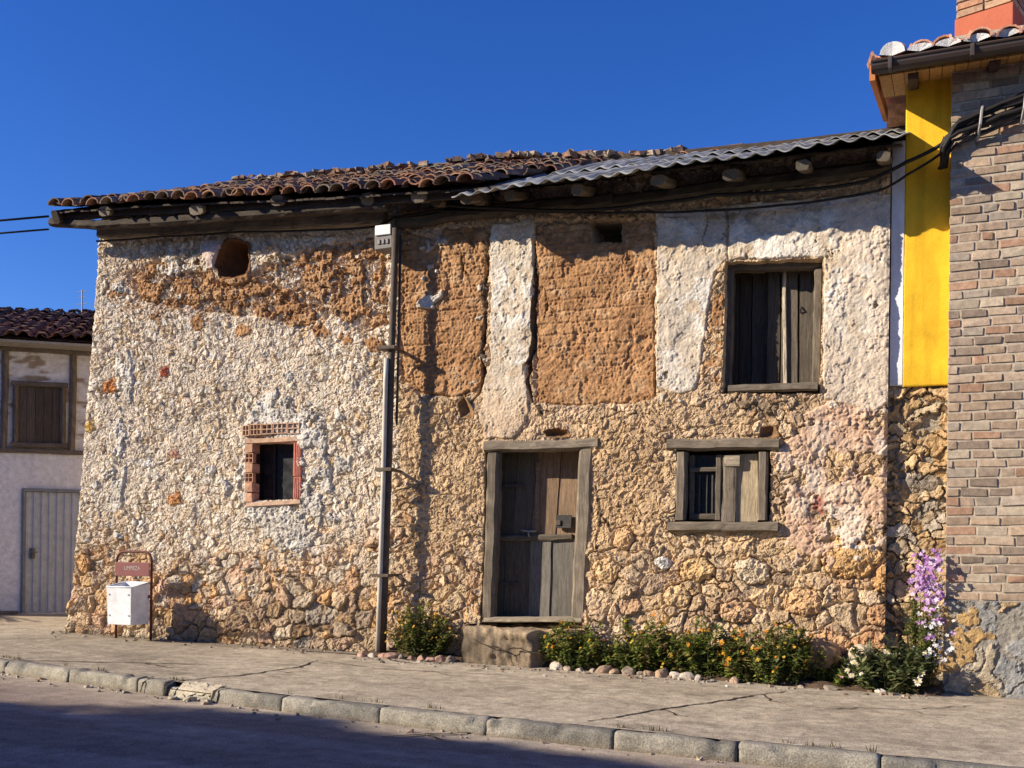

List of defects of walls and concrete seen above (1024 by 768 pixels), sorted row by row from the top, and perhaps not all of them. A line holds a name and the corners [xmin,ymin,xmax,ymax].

spalling [135,193,890,569]